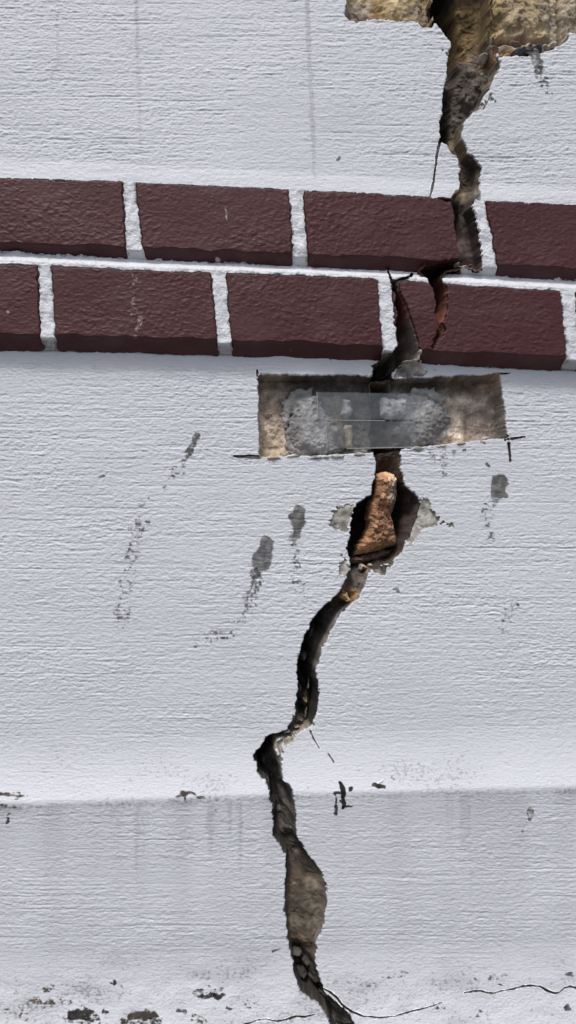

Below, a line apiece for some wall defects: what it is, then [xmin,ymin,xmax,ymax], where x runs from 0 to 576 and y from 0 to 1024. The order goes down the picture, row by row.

spalling [345,0,433,28]
spalling [477,0,576,66]
peeling [328,501,354,532]
crack [242,0,576,1024]
peeling [407,498,454,545]
water stain [116,519,150,619]
peeling [339,554,350,576]
peeling [373,562,394,575]
water stain [194,568,262,647]